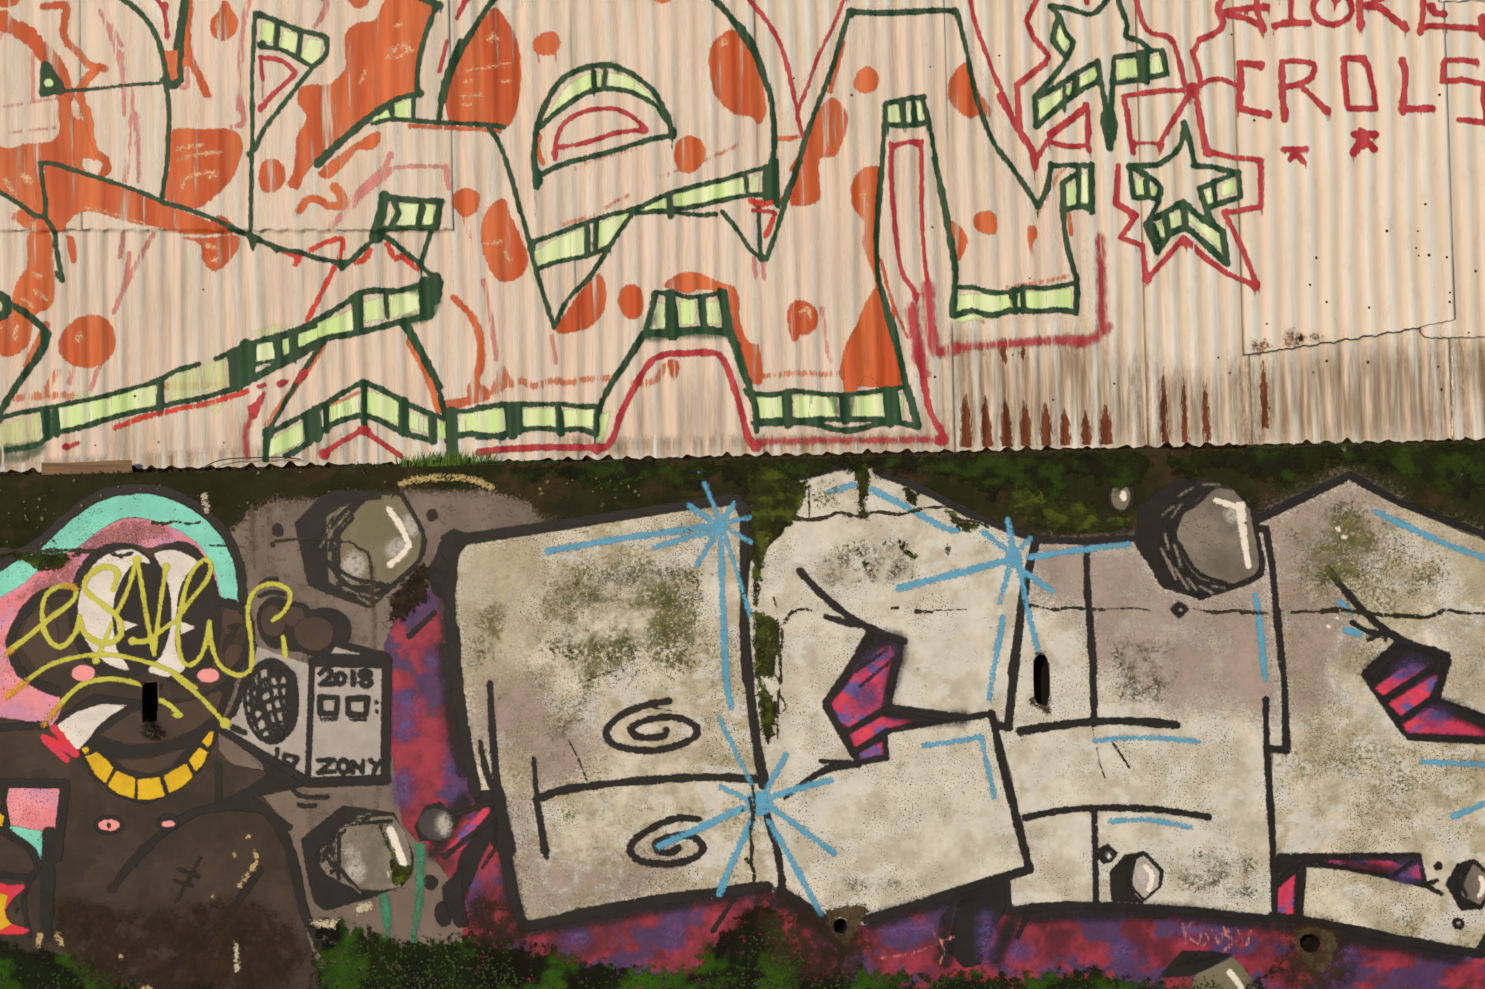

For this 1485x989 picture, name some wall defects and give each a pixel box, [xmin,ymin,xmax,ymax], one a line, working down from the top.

rust [960,394,1113,448]
rust [1160,370,1211,443]